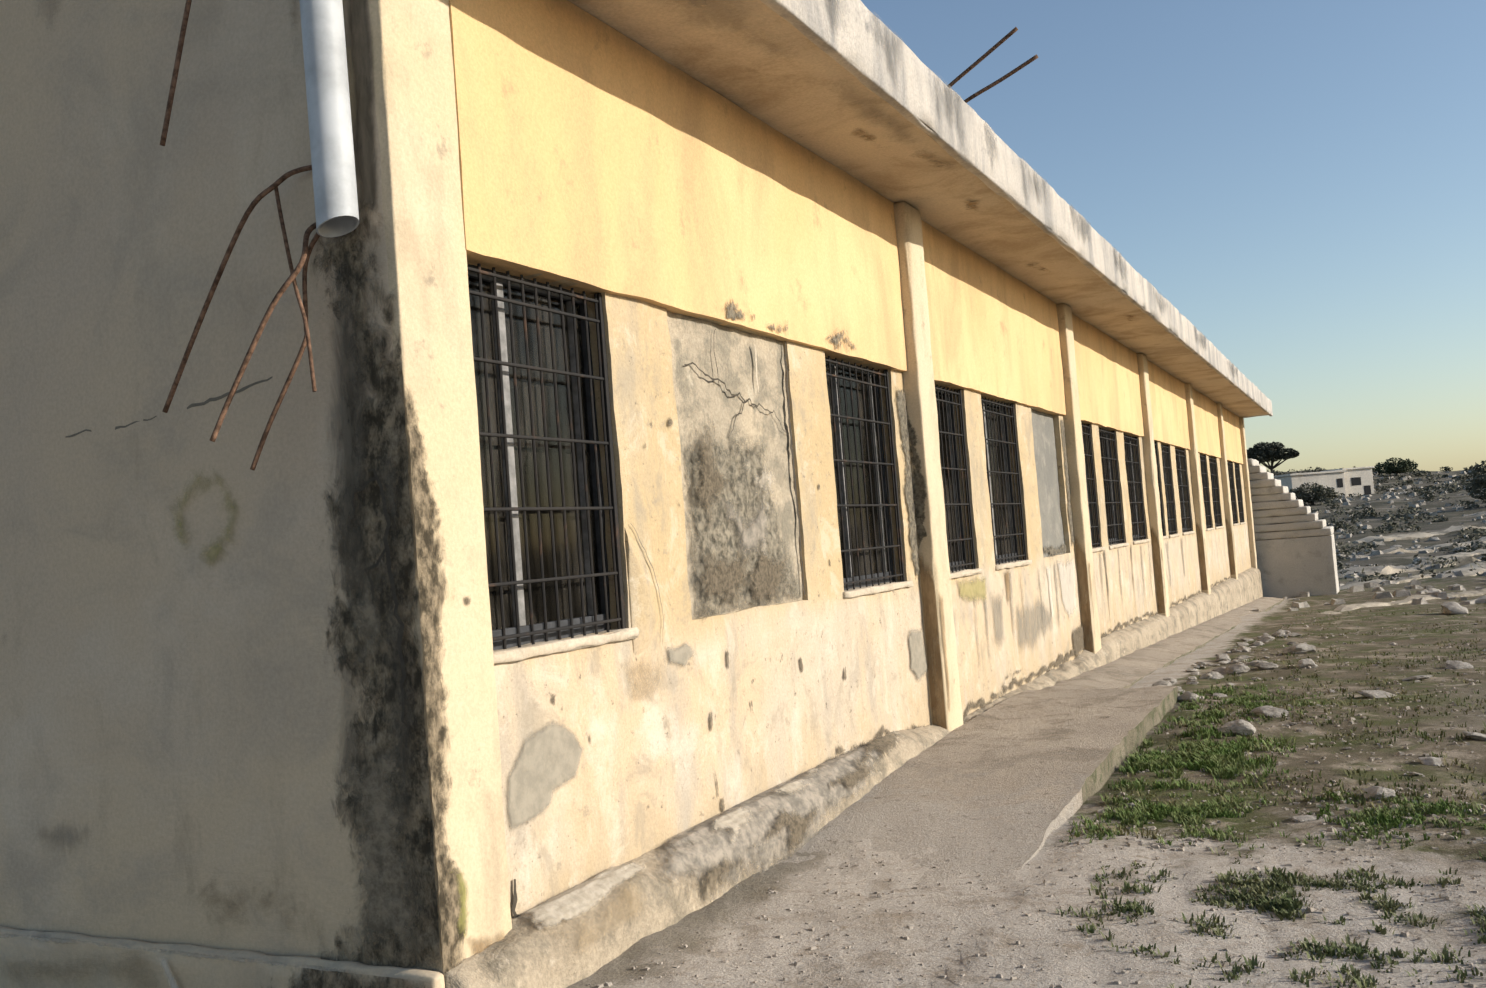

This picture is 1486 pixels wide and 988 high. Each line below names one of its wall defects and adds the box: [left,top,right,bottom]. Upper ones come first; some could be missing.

leakage [314,0,464,977]
flaking render [686,424,798,617]
crack [684,329,805,595]
peeling [508,723,590,827]
spalling [528,734,898,945]